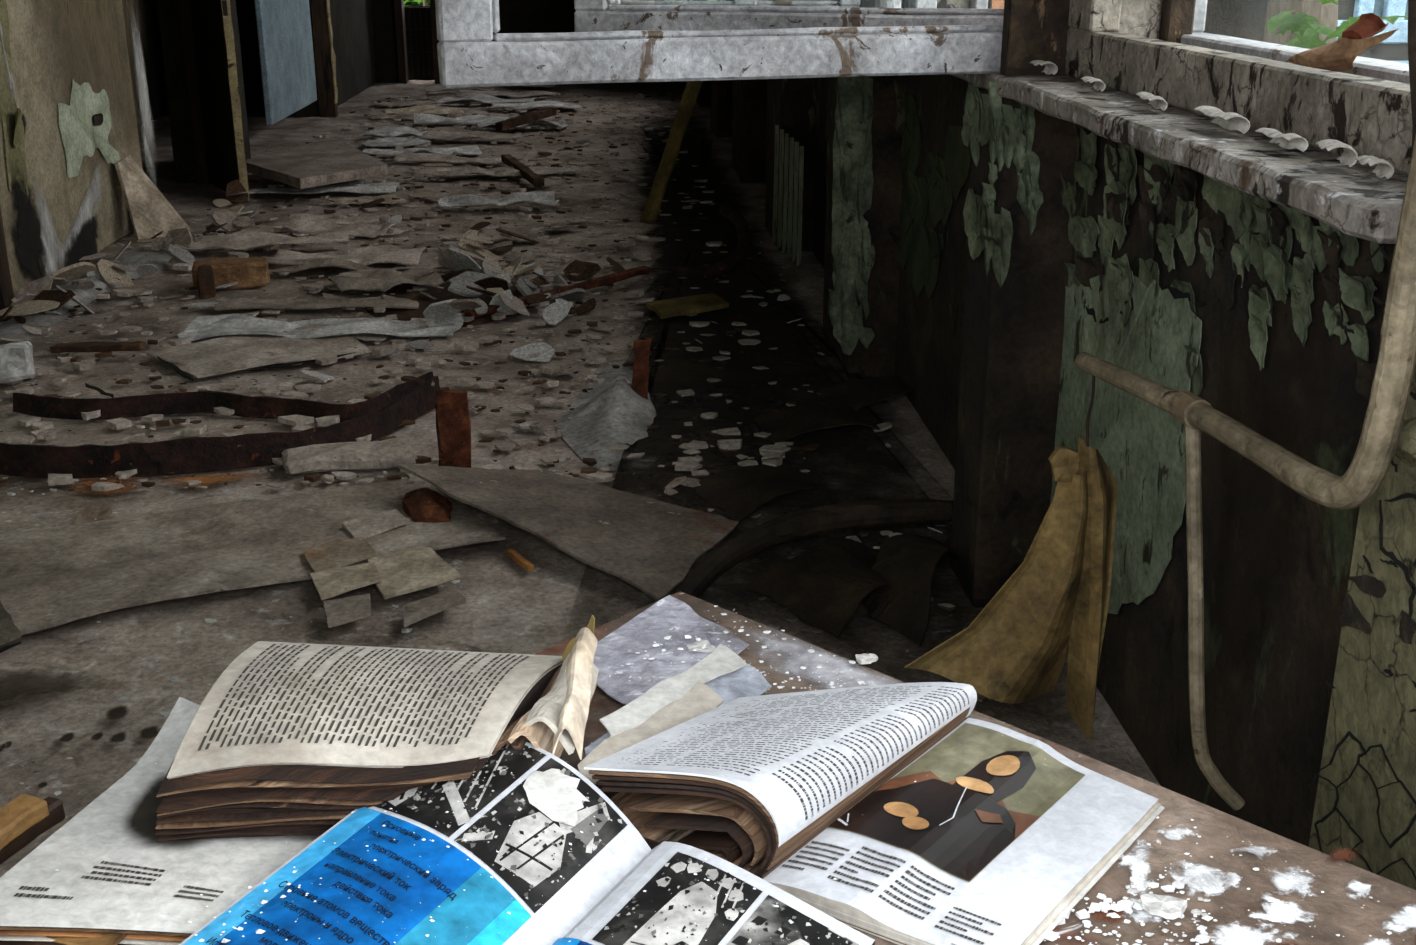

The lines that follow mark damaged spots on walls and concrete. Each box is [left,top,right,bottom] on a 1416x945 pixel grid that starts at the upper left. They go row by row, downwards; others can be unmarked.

peeling [0,0,29,195]
peeling [58,79,121,178]
peeling [828,76,875,355]
peeling [961,81,1043,287]
peeling [1055,125,1384,614]
crack [1330,460,1416,712]
crack [1303,731,1416,880]